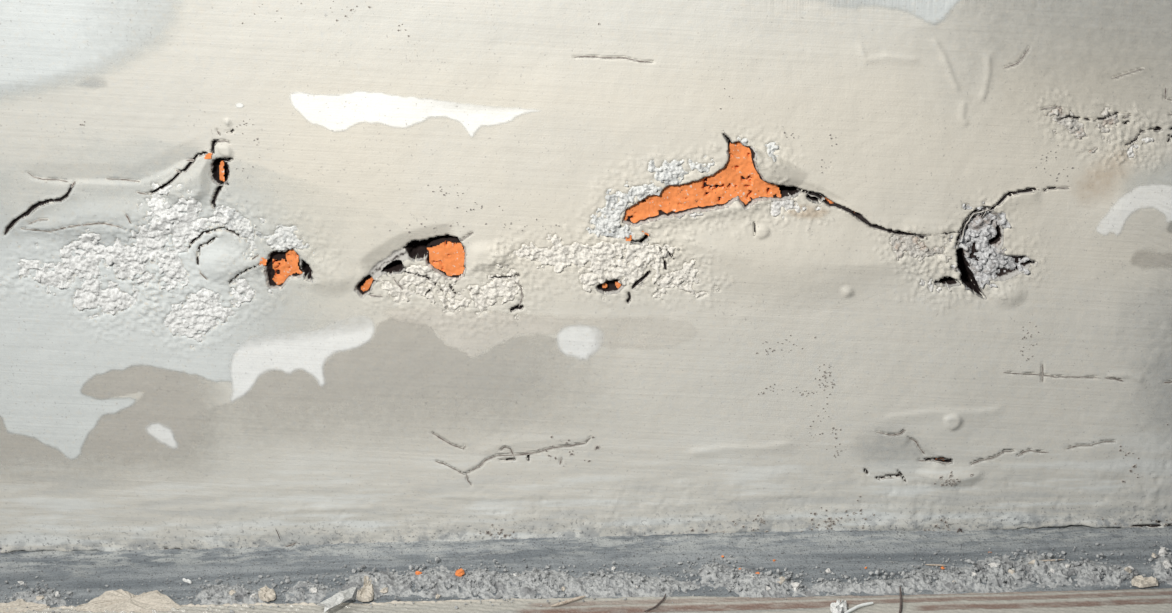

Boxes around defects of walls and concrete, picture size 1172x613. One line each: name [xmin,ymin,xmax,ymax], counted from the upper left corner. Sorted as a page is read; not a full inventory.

crack [1041,87,1172,145]
crack [4,129,260,283]
flaking render [11,181,315,347]
flaking render [354,130,833,316]
crack [797,187,1068,245]
flaking render [890,201,1038,299]
water stain [243,319,536,409]
water stain [0,416,64,460]
water stain [82,366,199,457]
crack [431,432,591,485]
crack [864,430,1115,481]